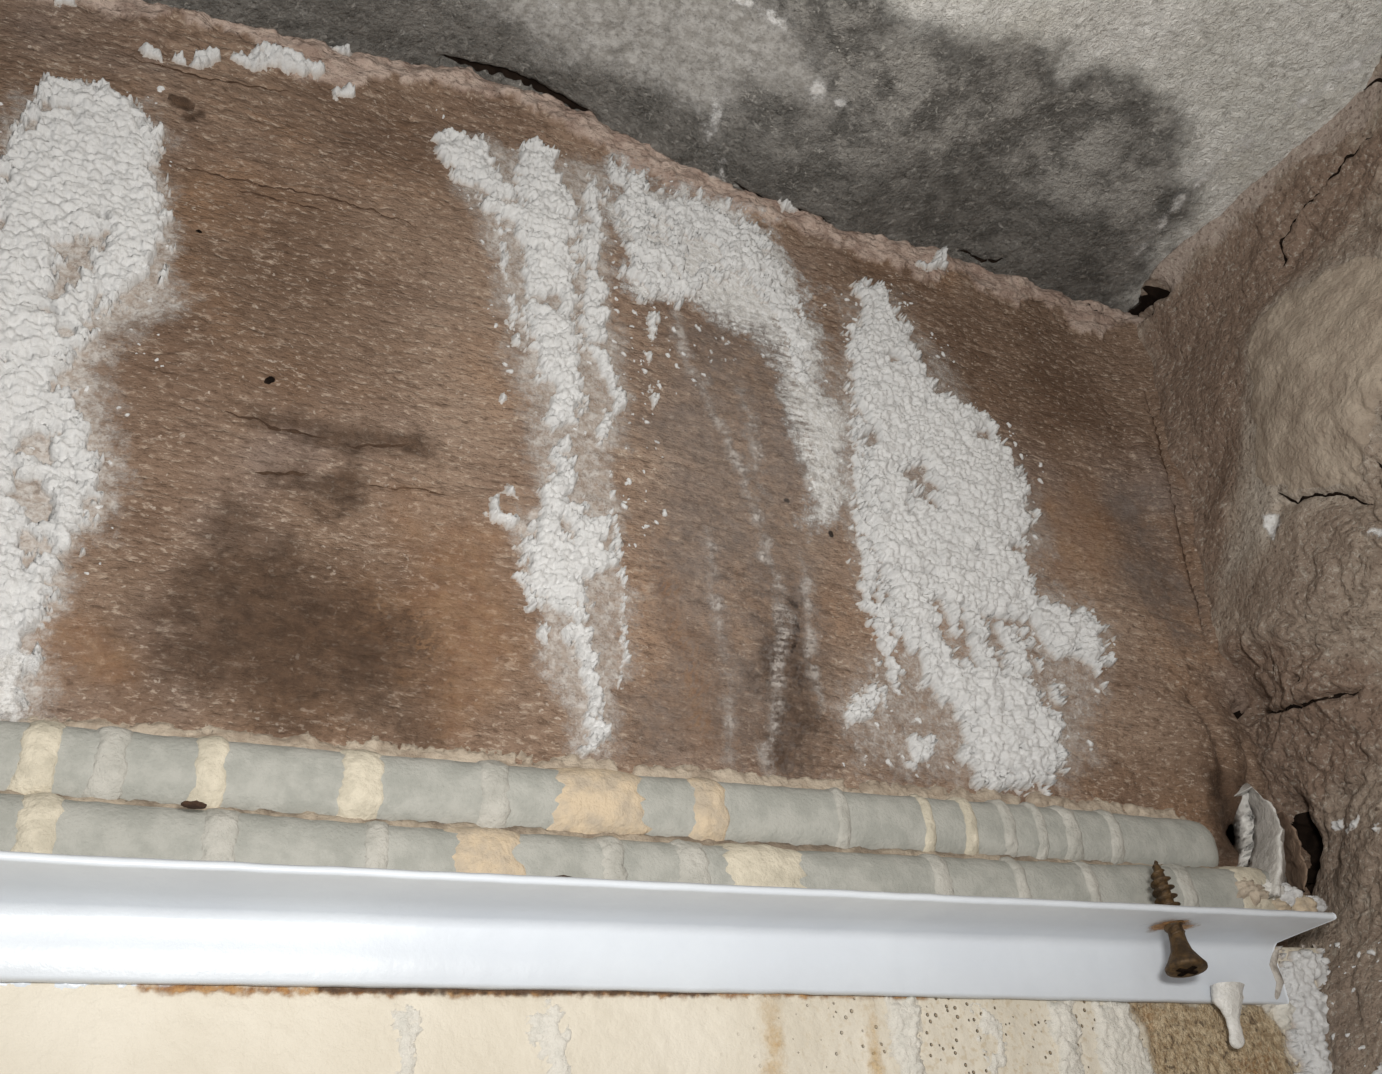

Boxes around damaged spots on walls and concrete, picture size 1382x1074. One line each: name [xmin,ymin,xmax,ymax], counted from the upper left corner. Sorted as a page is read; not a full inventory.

crack [1364,78,1382,90]
crack [1279,137,1372,266]
leakage [0,72,182,854]
leakage [138,0,1209,907]
crack [1278,492,1373,505]
crack [1233,680,1362,719]
crack [1290,812,1324,894]
corrosion [1151,920,1194,931]